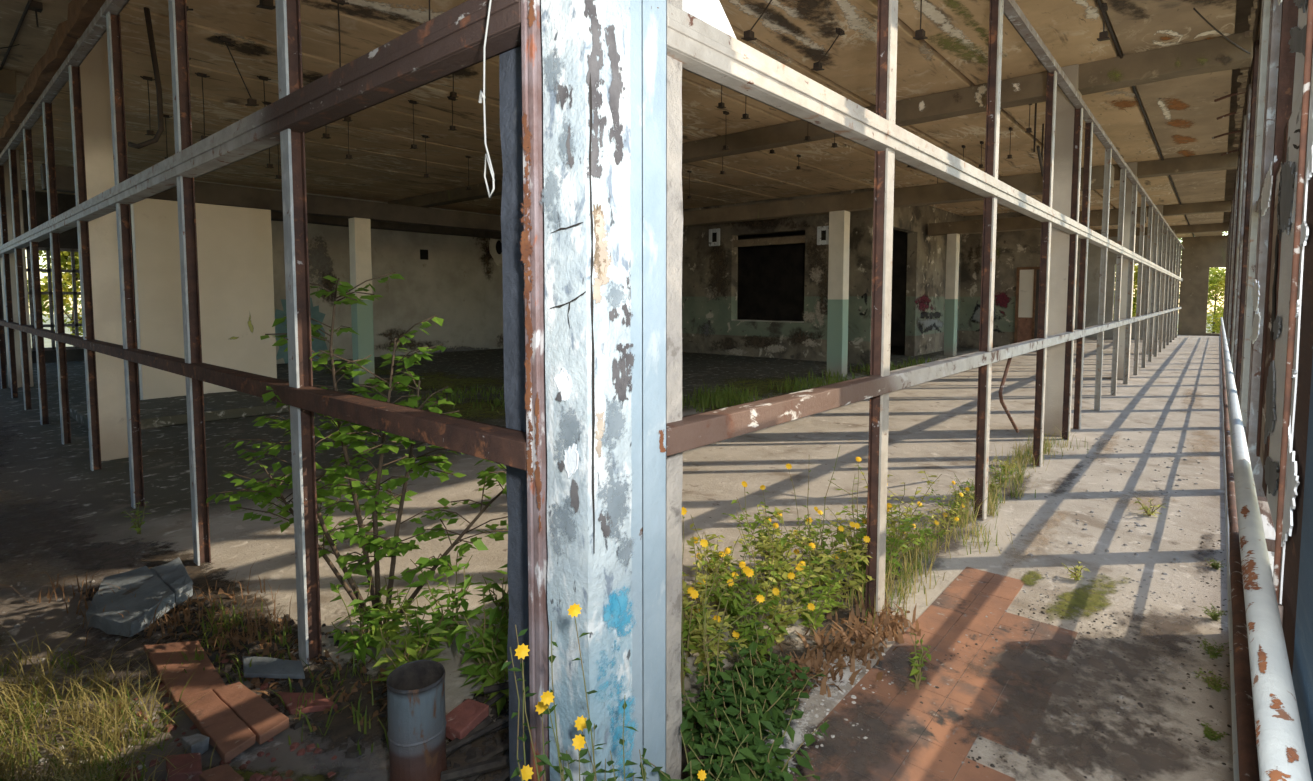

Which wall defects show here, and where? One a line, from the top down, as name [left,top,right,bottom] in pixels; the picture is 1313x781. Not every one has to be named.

water stain [302,0,445,25]
water stain [729,0,877,66]
water stain [1073,0,1145,20]
peeling [541,0,626,229]
spalling [1261,82,1313,246]
water stain [714,218,828,314]
rust [520,113,542,533]
peeling [550,343,635,566]
peeling [1264,360,1300,547]
rust [1239,535,1261,591]
rust [1248,622,1268,675]
rust [1267,747,1299,781]